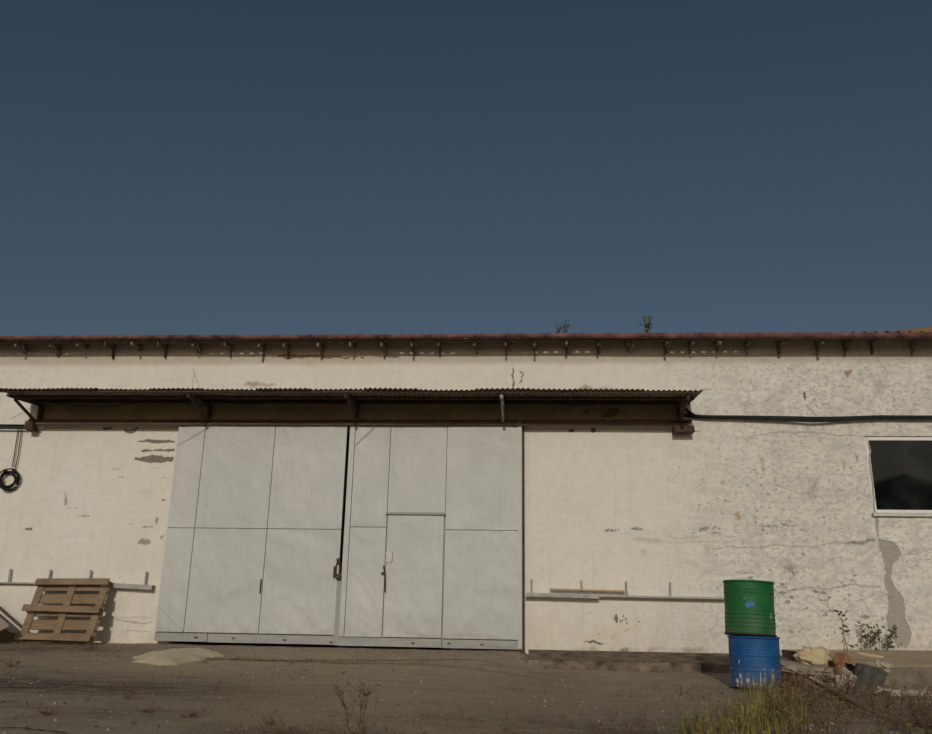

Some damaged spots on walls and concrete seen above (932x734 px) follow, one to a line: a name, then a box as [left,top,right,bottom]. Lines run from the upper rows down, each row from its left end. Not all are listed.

peeling [124,427,175,463]
peeling [774,574,858,617]
flaking render [847,516,915,650]